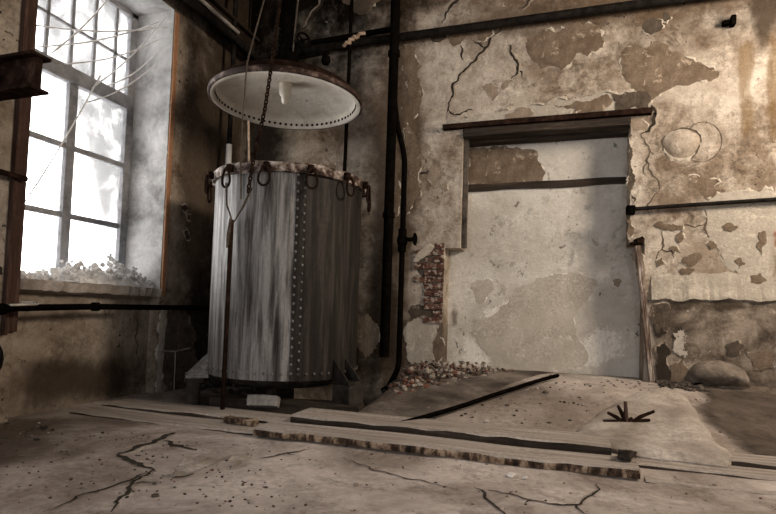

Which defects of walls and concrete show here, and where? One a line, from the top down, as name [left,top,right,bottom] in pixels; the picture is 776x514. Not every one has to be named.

peeling [342,0,380,15]
crack [440,0,459,23]
damp [751,0,776,37]
crack [446,28,523,119]
peeling [447,13,719,205]
crack [639,105,660,215]
spalling [403,243,446,367]
peeling [469,272,598,373]
spalling [630,174,776,388]
crack [43,432,197,512]
crack [343,457,453,489]
crack [474,483,601,514]